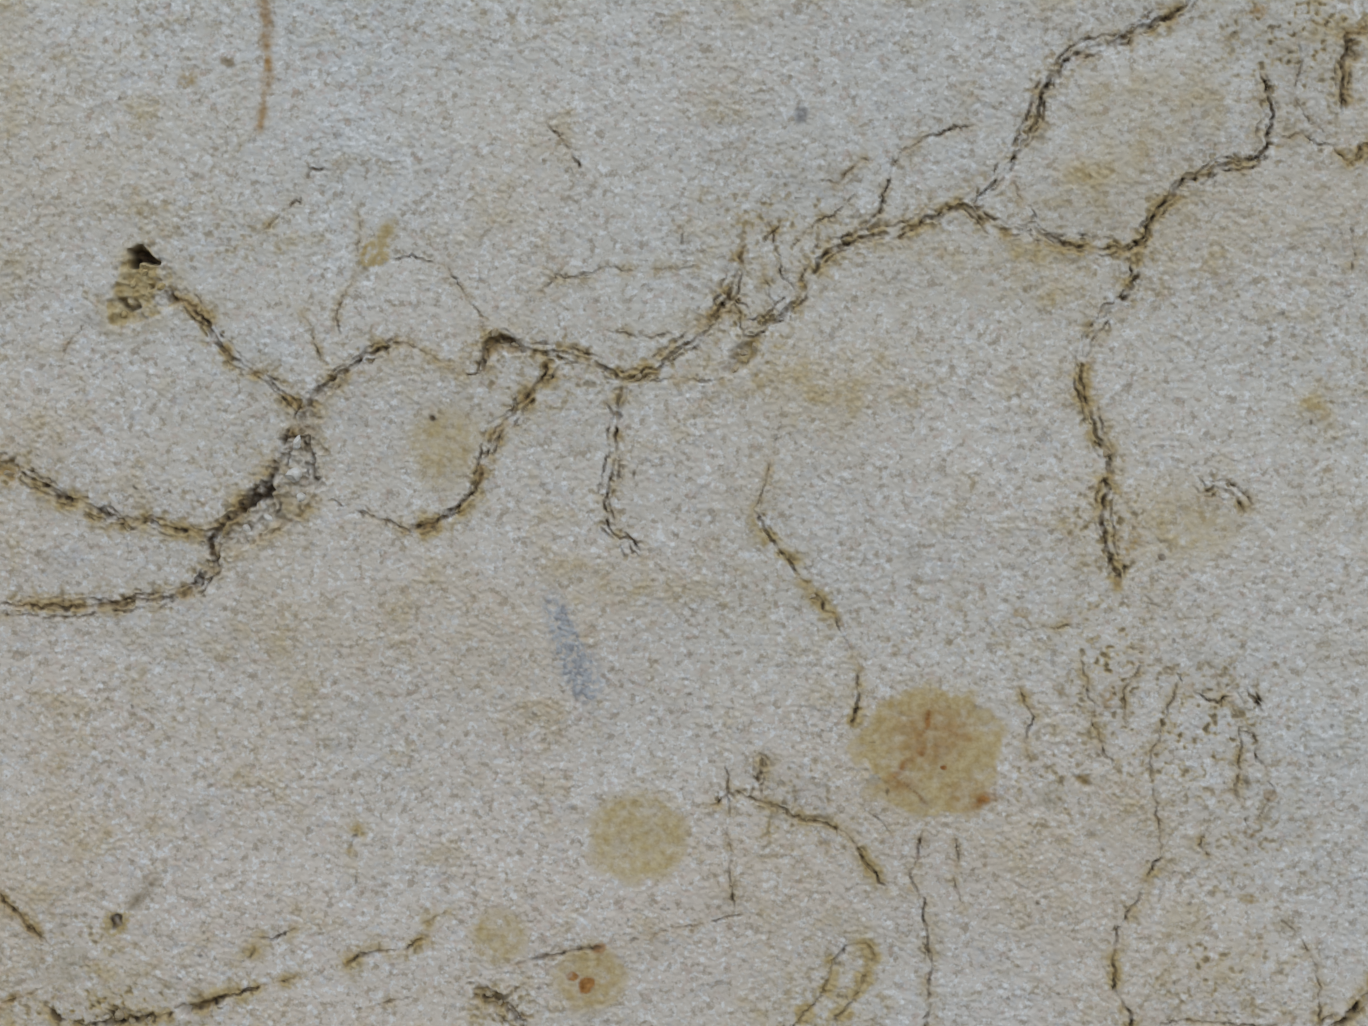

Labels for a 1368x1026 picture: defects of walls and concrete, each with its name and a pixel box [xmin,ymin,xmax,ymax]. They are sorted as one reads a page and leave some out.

rust [254,0,278,137]
spalling [102,244,180,334]
crack [0,0,1368,624]
spalling [203,371,336,561]
crack [751,425,865,731]
rust [546,935,636,1023]
damp [582,785,694,891]
crack [340,748,967,1026]
crack [1007,623,1368,1026]